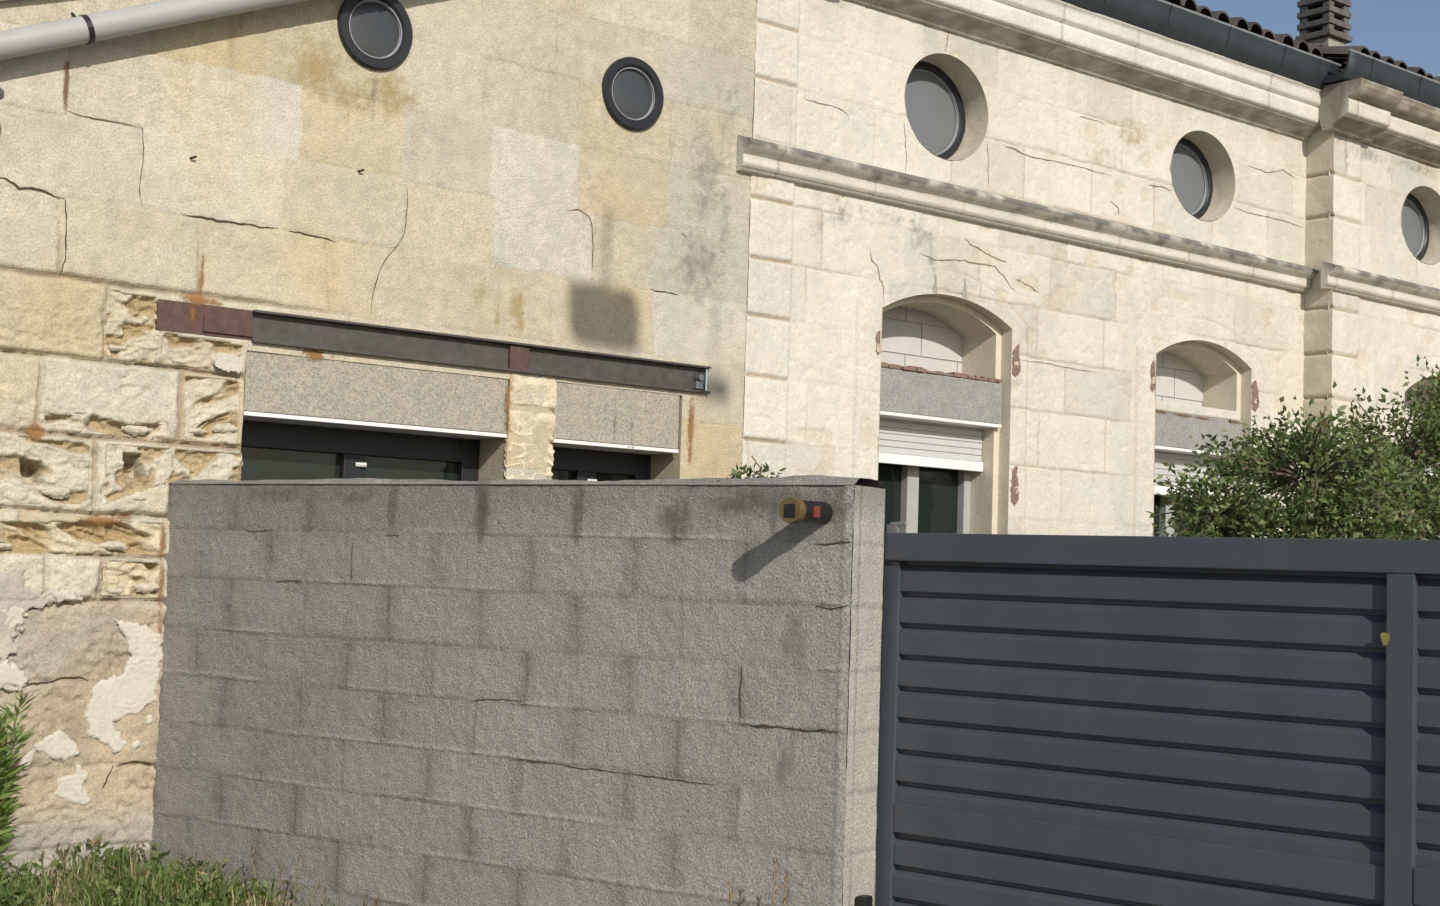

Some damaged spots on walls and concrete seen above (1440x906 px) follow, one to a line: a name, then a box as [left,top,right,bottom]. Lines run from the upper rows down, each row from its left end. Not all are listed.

crack [67,110,144,205]
crack [0,177,67,275]
crack [371,187,408,308]
flaking render [20,618,164,806]